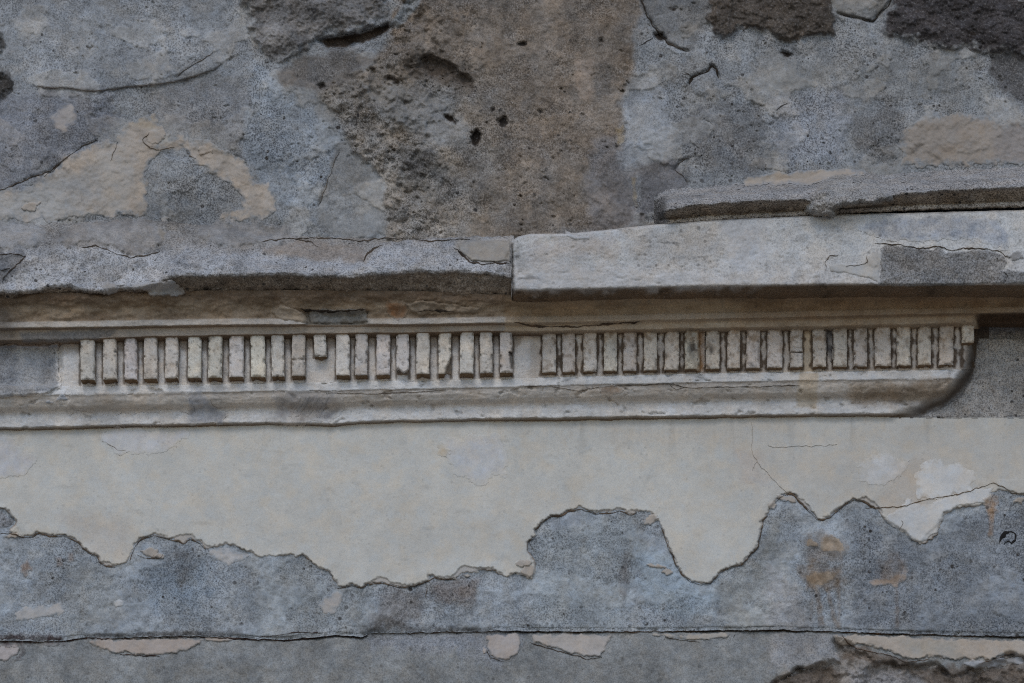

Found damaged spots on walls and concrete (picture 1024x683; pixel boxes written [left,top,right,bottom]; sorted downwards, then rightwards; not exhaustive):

crack [641,0,719,84]
crack [43,53,218,92]
flaking render [49,102,79,134]
crack [0,140,116,190]
flaking render [0,113,277,225]
crack [262,237,507,265]
crack [825,243,1010,278]
crack [661,430,1019,584]
spalling [0,458,1024,683]
crack [5,629,1024,663]